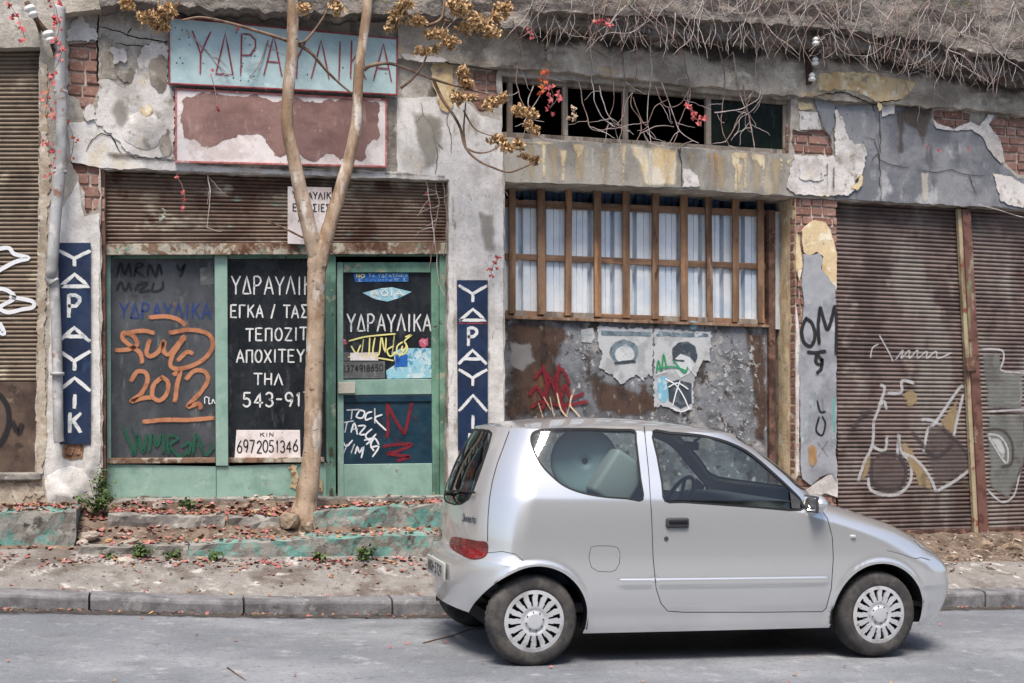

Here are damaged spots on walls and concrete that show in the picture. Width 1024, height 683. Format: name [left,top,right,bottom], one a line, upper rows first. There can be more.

crack [96,15,169,82]
flaking render [66,16,175,160]
flaking render [401,53,497,113]
flaking render [70,162,105,222]
crack [86,133,161,160]
water stain [530,142,677,186]
water stain [719,152,790,190]
flaking render [785,71,921,197]
crack [813,91,985,199]
flaking render [932,110,1024,208]
flaking render [795,220,838,498]